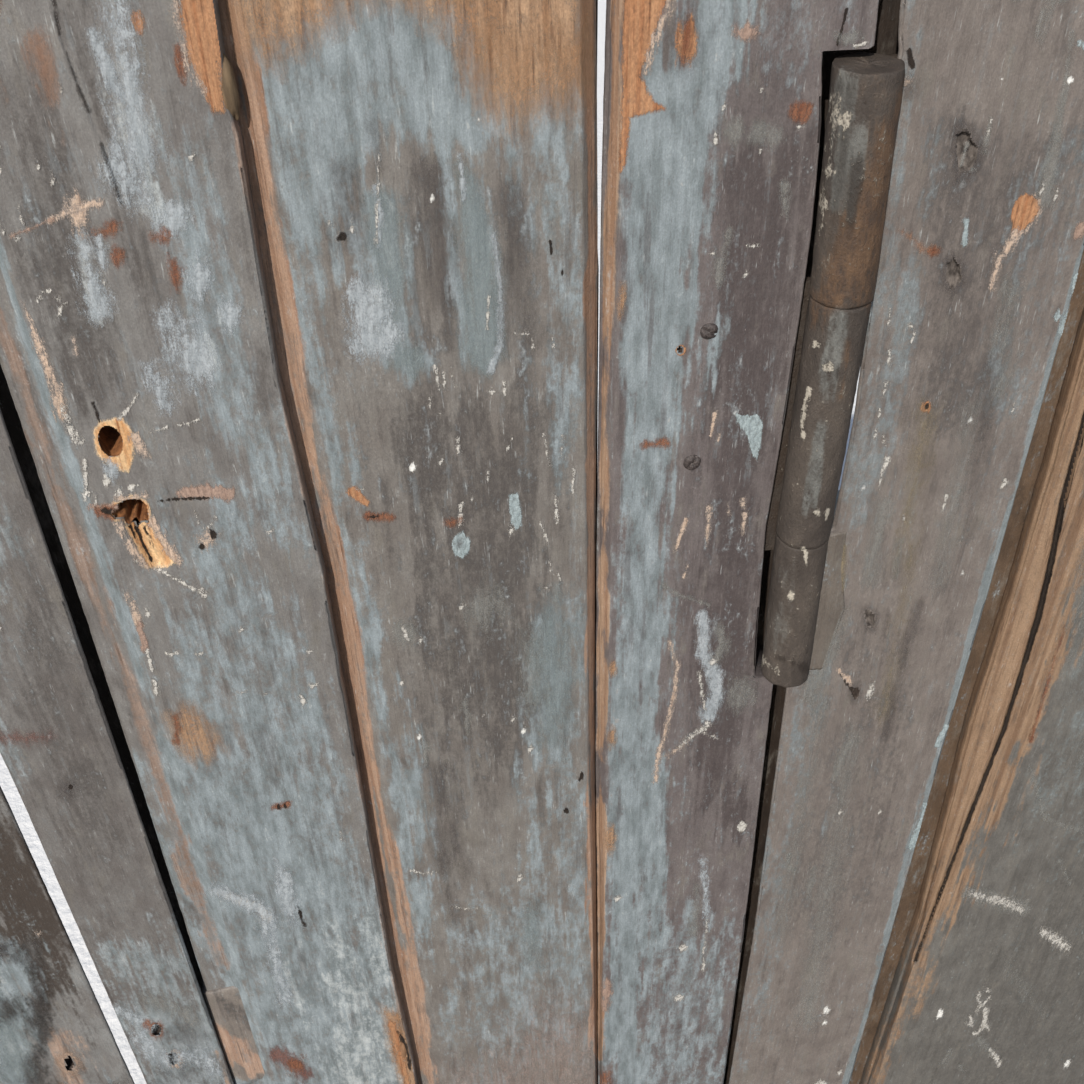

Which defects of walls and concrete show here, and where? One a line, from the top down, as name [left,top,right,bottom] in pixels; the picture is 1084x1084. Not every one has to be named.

peeling [171,0,225,113]
peeling [234,0,333,56]
peeling [423,0,590,127]
peeling [619,0,676,173]
corrosion [789,102,813,129]
spalling [955,129,978,173]
peeling [988,192,1043,292]
crack [914,415,1084,962]
peeling [966,988,1002,1068]